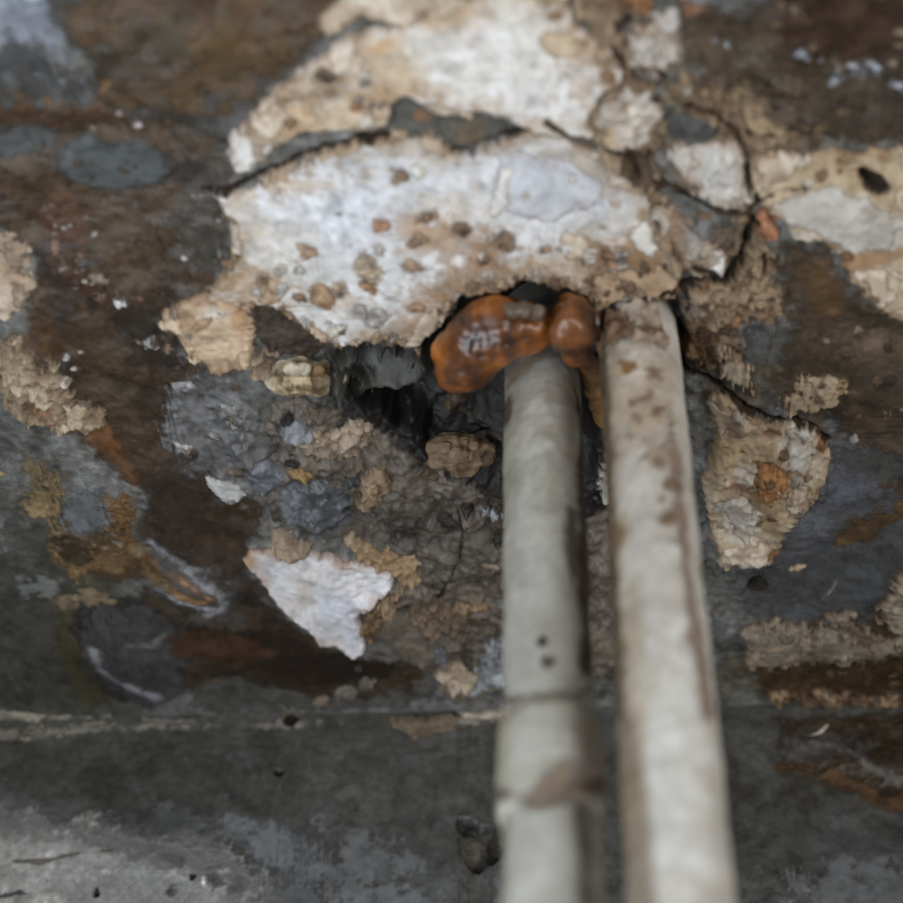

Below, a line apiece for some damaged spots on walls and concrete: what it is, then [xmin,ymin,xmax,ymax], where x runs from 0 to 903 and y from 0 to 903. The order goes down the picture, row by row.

crack [206,131,392,198]
crack [490,46,840,317]
peeling [0,235,30,308]
peeling [0,335,90,437]
water stain [60,351,82,389]
water stain [161,379,266,509]
water stain [280,420,314,447]
peeling [158,0,903,707]
corrosion [566,390,593,675]